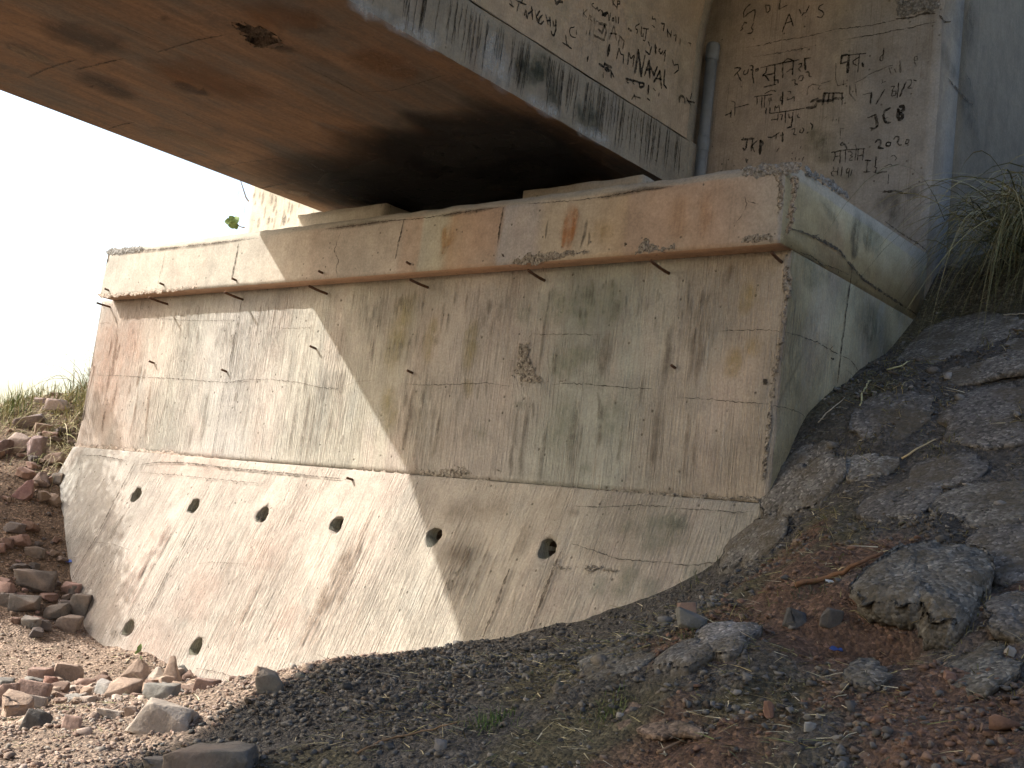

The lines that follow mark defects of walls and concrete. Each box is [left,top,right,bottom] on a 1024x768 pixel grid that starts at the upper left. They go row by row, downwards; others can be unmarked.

spalling [232,22,283,49]
damp [397,0,682,174]
spalling [512,250,589,282]
spalling [635,238,675,275]
spalling [741,162,849,481]
crack [725,229,915,378]
crack [530,544,716,629]